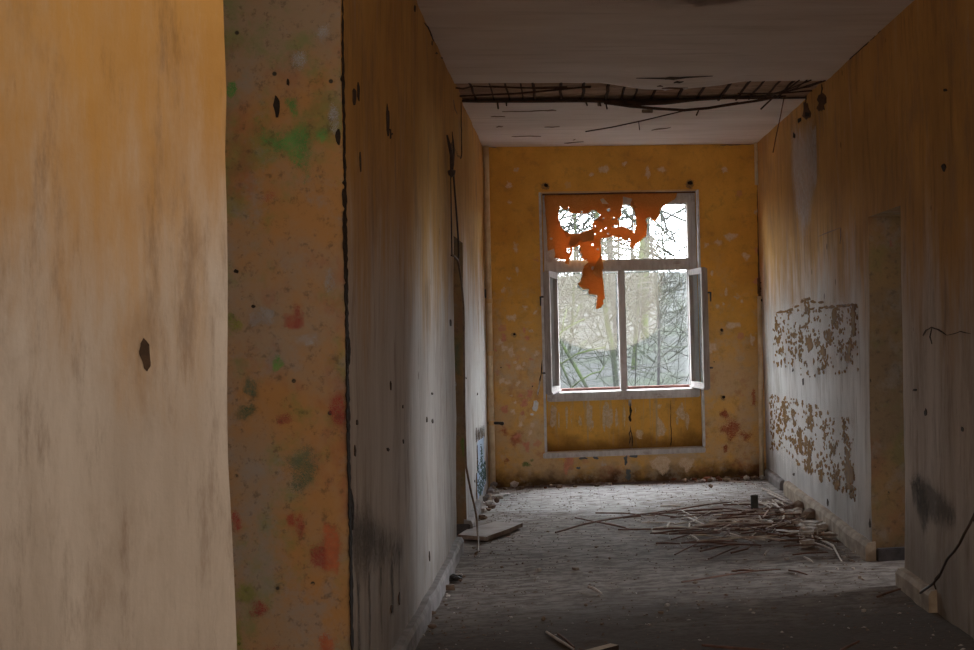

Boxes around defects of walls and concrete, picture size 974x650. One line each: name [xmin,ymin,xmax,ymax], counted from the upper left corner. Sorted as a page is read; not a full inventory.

spalling [793,84,827,138]
spalling [742,195,762,296]
peeling [768,292,860,506]